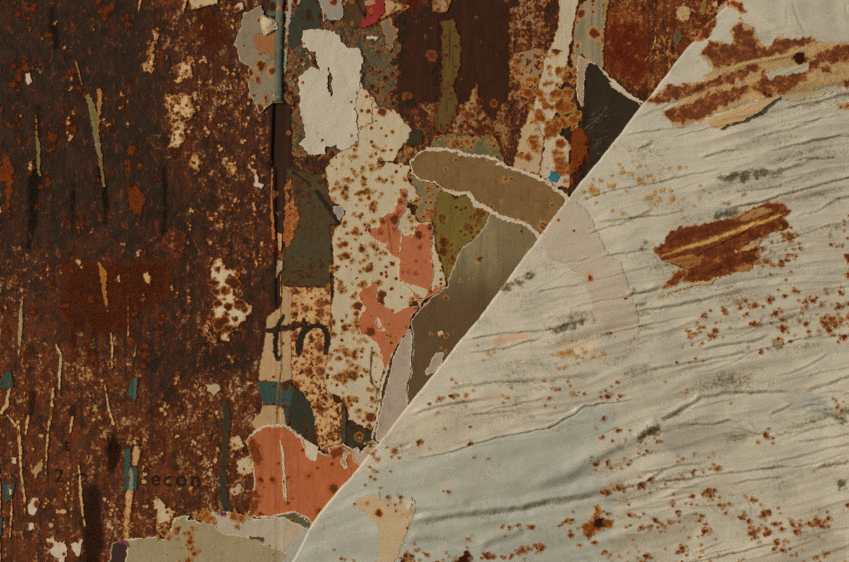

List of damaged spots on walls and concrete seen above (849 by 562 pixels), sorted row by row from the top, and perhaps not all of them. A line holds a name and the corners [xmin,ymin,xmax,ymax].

peeling [288,0,364,155]
peeling [366,0,410,53]
peeling [431,0,451,15]
peeling [508,0,606,189]
rust [646,0,849,128]
peeling [216,144,265,216]
rust [327,144,396,299]
rust [582,164,849,348]
peeling [200,257,254,344]
rust [208,266,248,334]
rust [558,488,732,562]
rust [736,495,832,562]